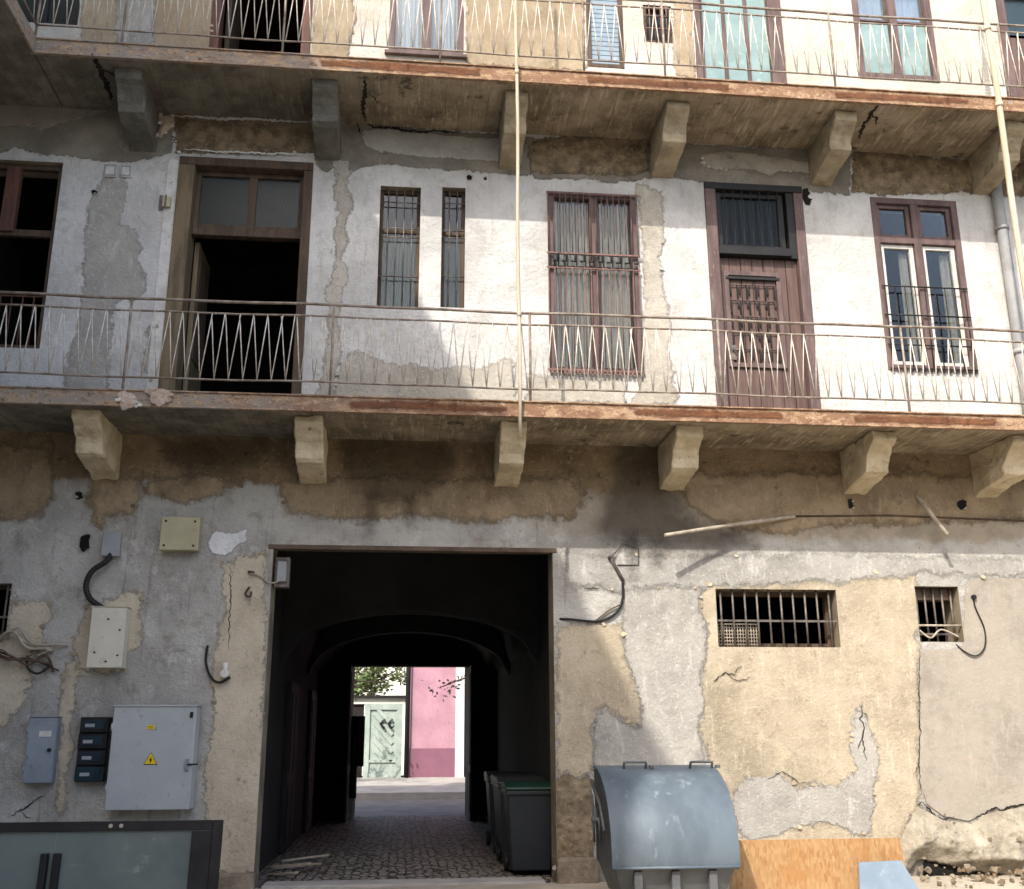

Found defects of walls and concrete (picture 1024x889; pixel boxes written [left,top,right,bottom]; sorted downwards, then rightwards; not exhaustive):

corrosion [321,60,480,76]
crack [357,77,459,134]
corrosion [586,75,729,91]
crack [858,105,879,139]
flaking render [527,135,650,181]
corrosion [634,409,782,419]
corrosion [855,415,996,426]
flaking render [0,440,56,522]
flaking render [560,547,1024,840]
flaking render [552,622,643,870]
crack [858,708,867,761]
crack [914,658,1024,820]